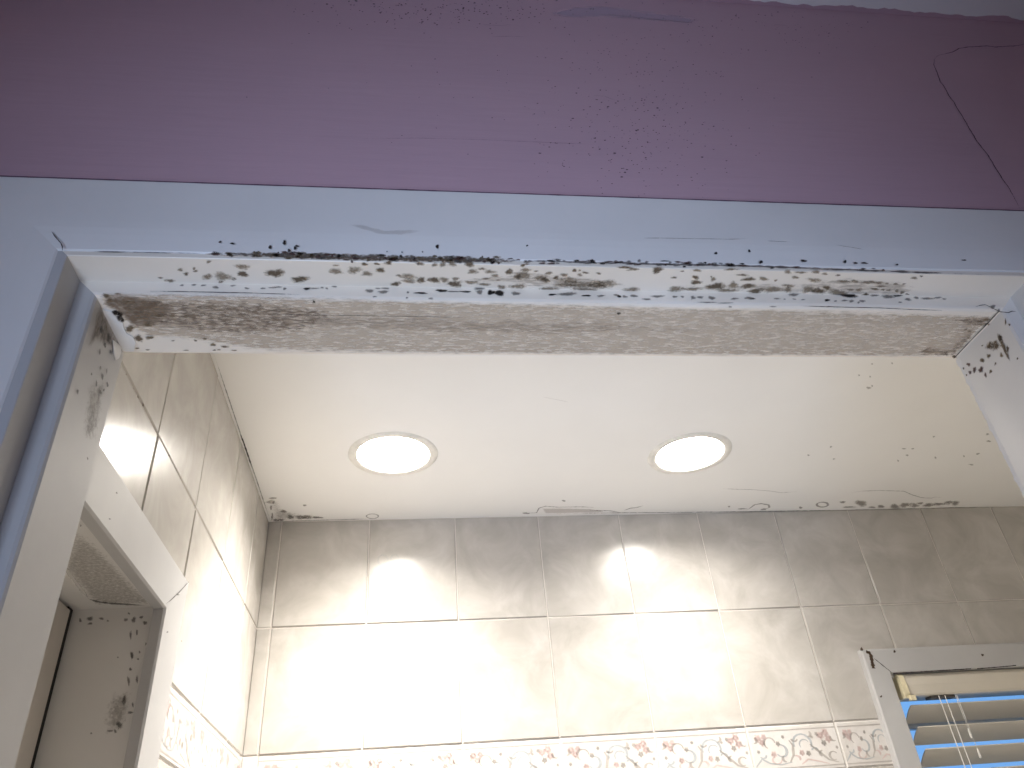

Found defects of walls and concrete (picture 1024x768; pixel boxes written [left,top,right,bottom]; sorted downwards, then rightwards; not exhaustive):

crack [933,44,1023,204]
damp [91,240,1018,393]
damp [93,600,147,714]